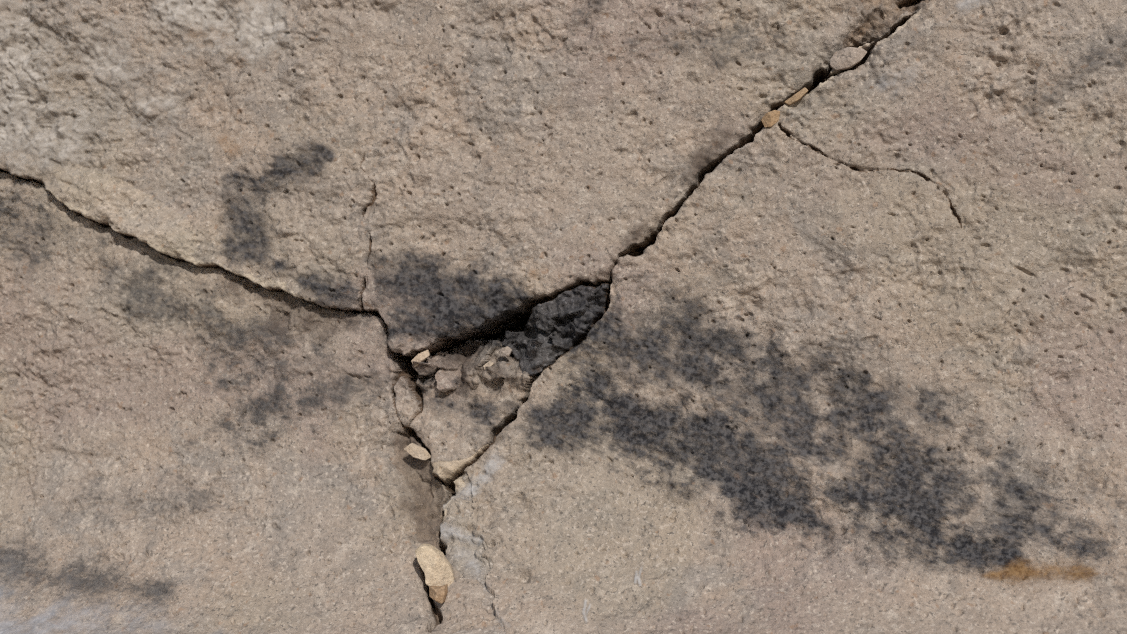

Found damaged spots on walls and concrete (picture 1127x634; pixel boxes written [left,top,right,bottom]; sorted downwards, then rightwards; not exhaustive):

crack [0,0,962,555]
water stain [526,381,830,540]
water stain [855,507,1020,568]
crack [421,570,443,632]
corrosion [983,563,1097,579]